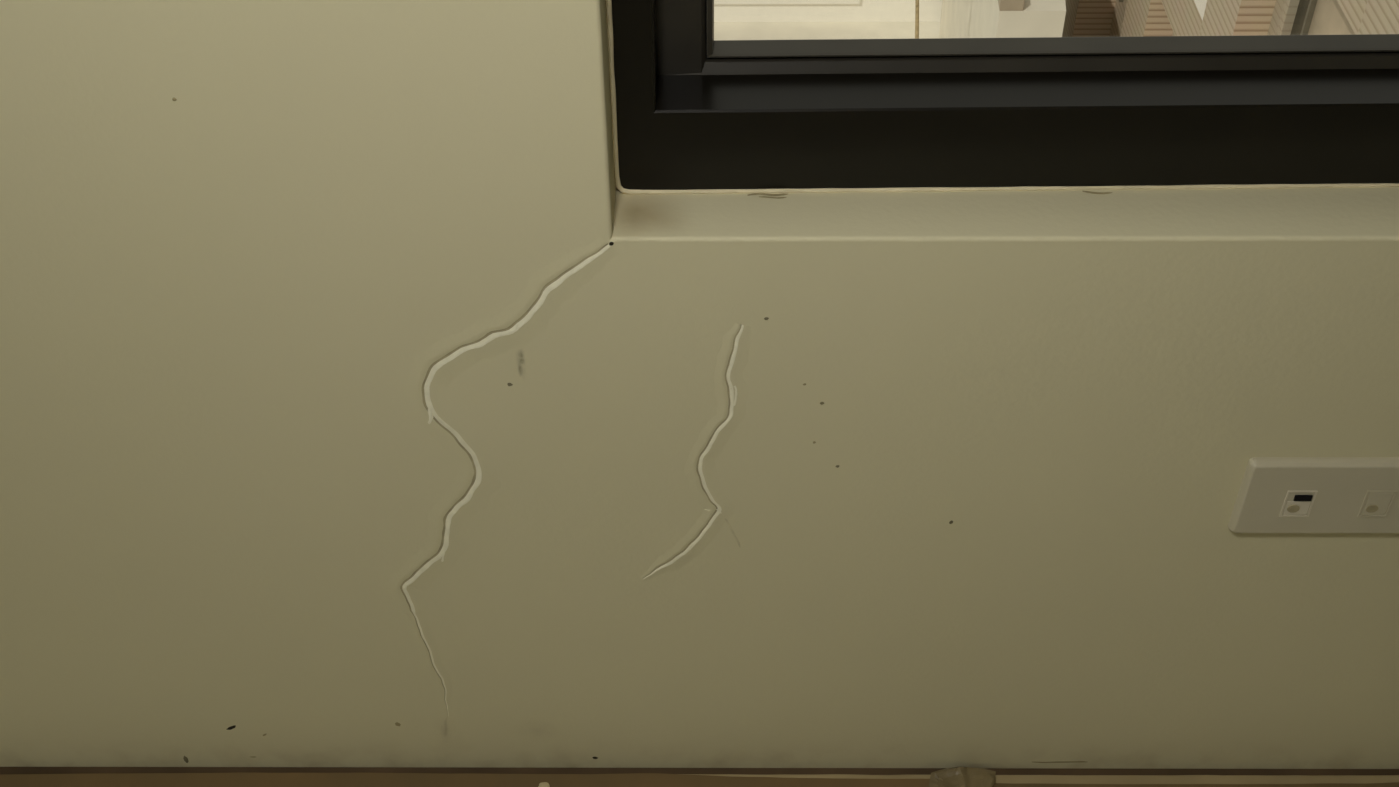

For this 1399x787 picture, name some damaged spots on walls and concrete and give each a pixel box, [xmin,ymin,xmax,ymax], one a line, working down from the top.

crack [388,237,619,737]
crack [641,323,751,580]